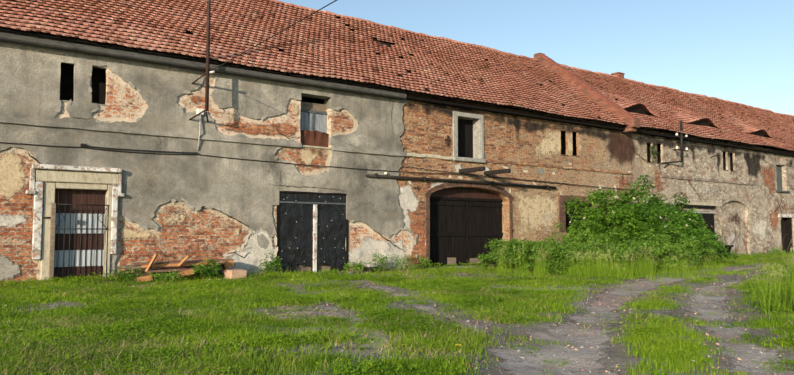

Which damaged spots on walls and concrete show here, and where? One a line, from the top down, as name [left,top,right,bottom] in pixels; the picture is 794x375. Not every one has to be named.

spalling [54,99,71,118]
spalling [88,66,148,123]
spalling [176,73,358,176]
peeling [535,122,585,165]
spalling [0,146,43,286]
spalling [112,198,278,277]
peeling [509,170,562,240]